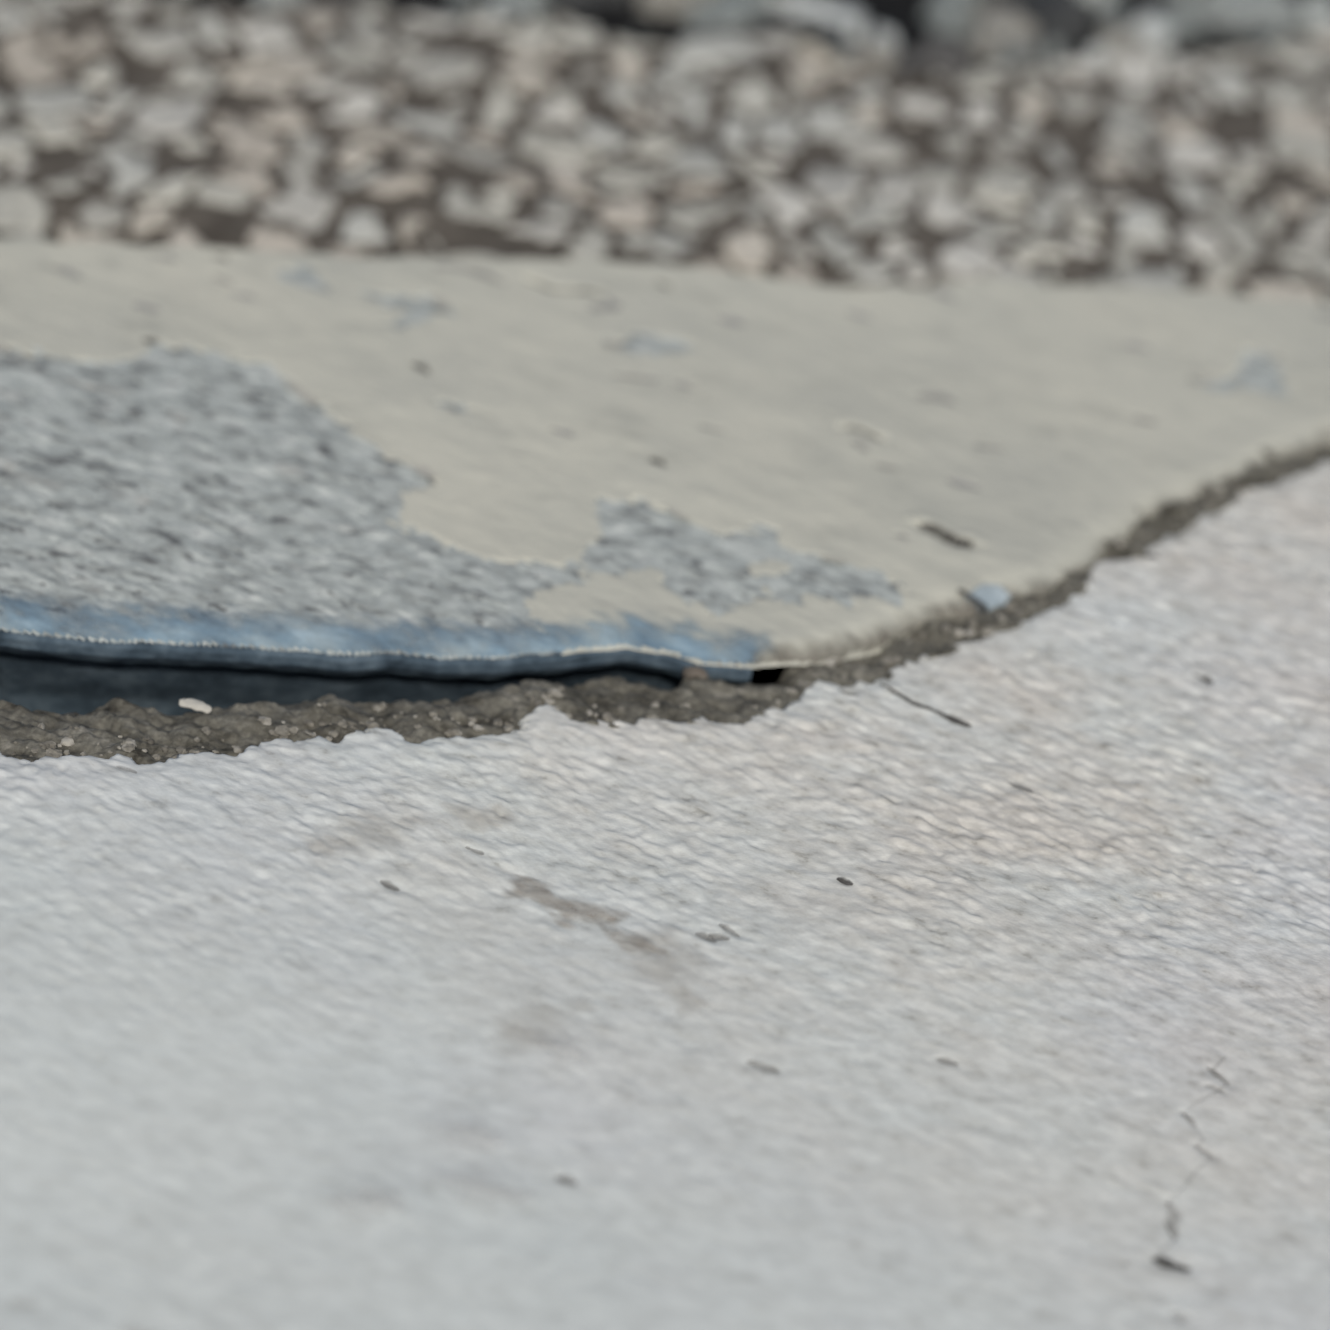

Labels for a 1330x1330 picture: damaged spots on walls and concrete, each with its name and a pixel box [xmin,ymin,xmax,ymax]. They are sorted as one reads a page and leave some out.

peeling [0,338,906,660]
crack [0,441,1330,765]
crack [1152,1257,1191,1271]